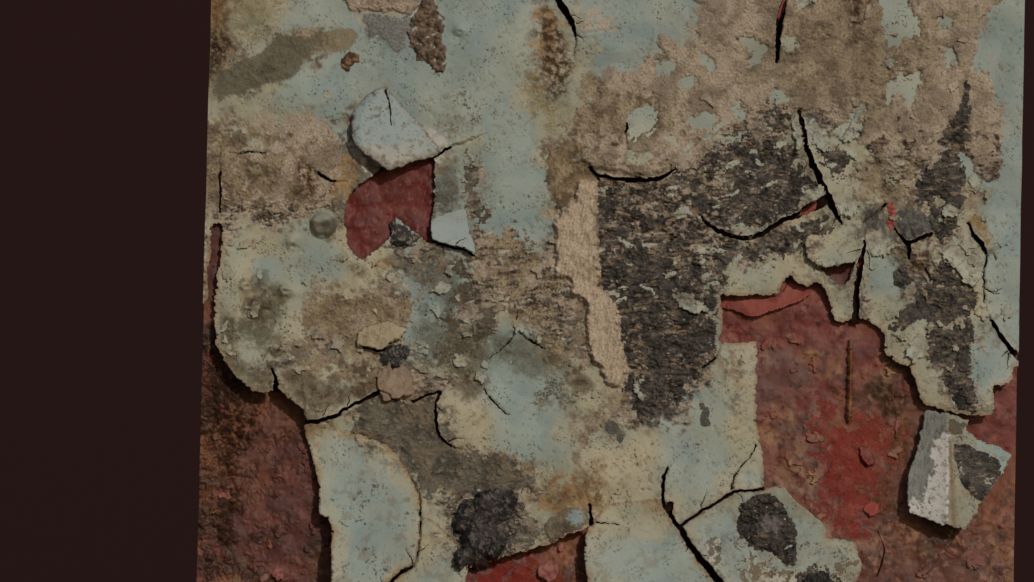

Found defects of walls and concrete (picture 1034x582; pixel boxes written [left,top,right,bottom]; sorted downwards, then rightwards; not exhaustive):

crack [555,0,585,41]
crack [775,0,787,63]
spalling [216,87,441,224]
peeling [607,284,655,307]
peeling [699,248,743,291]
peeling [703,283,811,317]
crack [701,109,932,325]
corrosion [207,370,261,544]
peeling [296,423,468,582]
crack [661,444,764,582]
peeling [584,486,862,582]
peeling [859,410,1012,530]